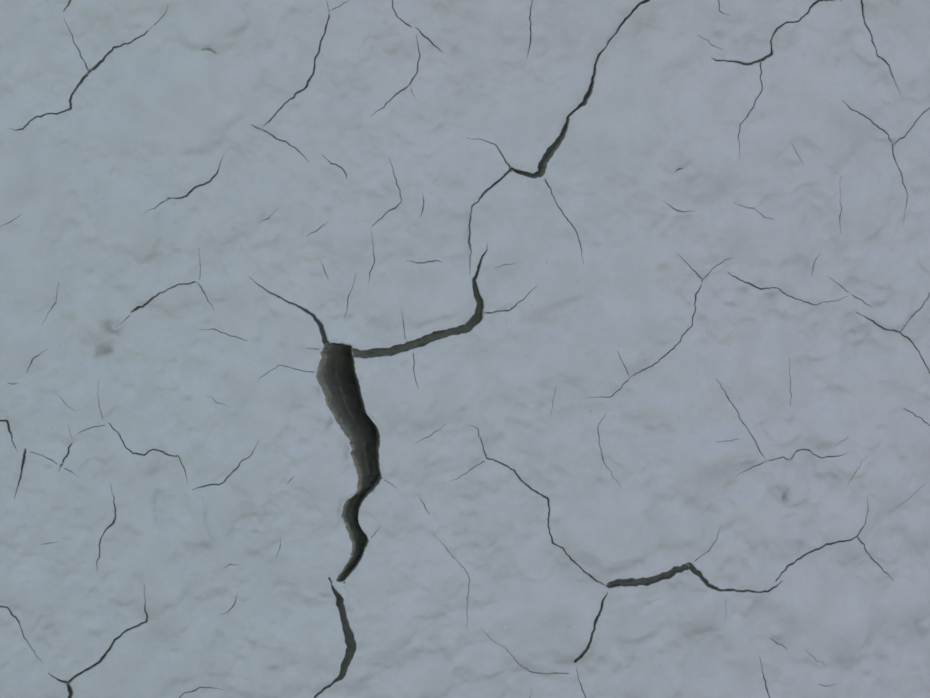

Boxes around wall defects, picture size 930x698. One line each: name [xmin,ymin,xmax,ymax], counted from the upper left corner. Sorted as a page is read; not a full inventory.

crack [7,0,171,133]
crack [141,151,227,216]
crack [5,280,62,387]
crack [111,245,251,343]
crack [246,0,930,698]
crack [0,378,262,502]
crack [94,478,119,574]
crack [0,582,151,698]
crack [176,684,228,698]
crack [215,590,240,618]